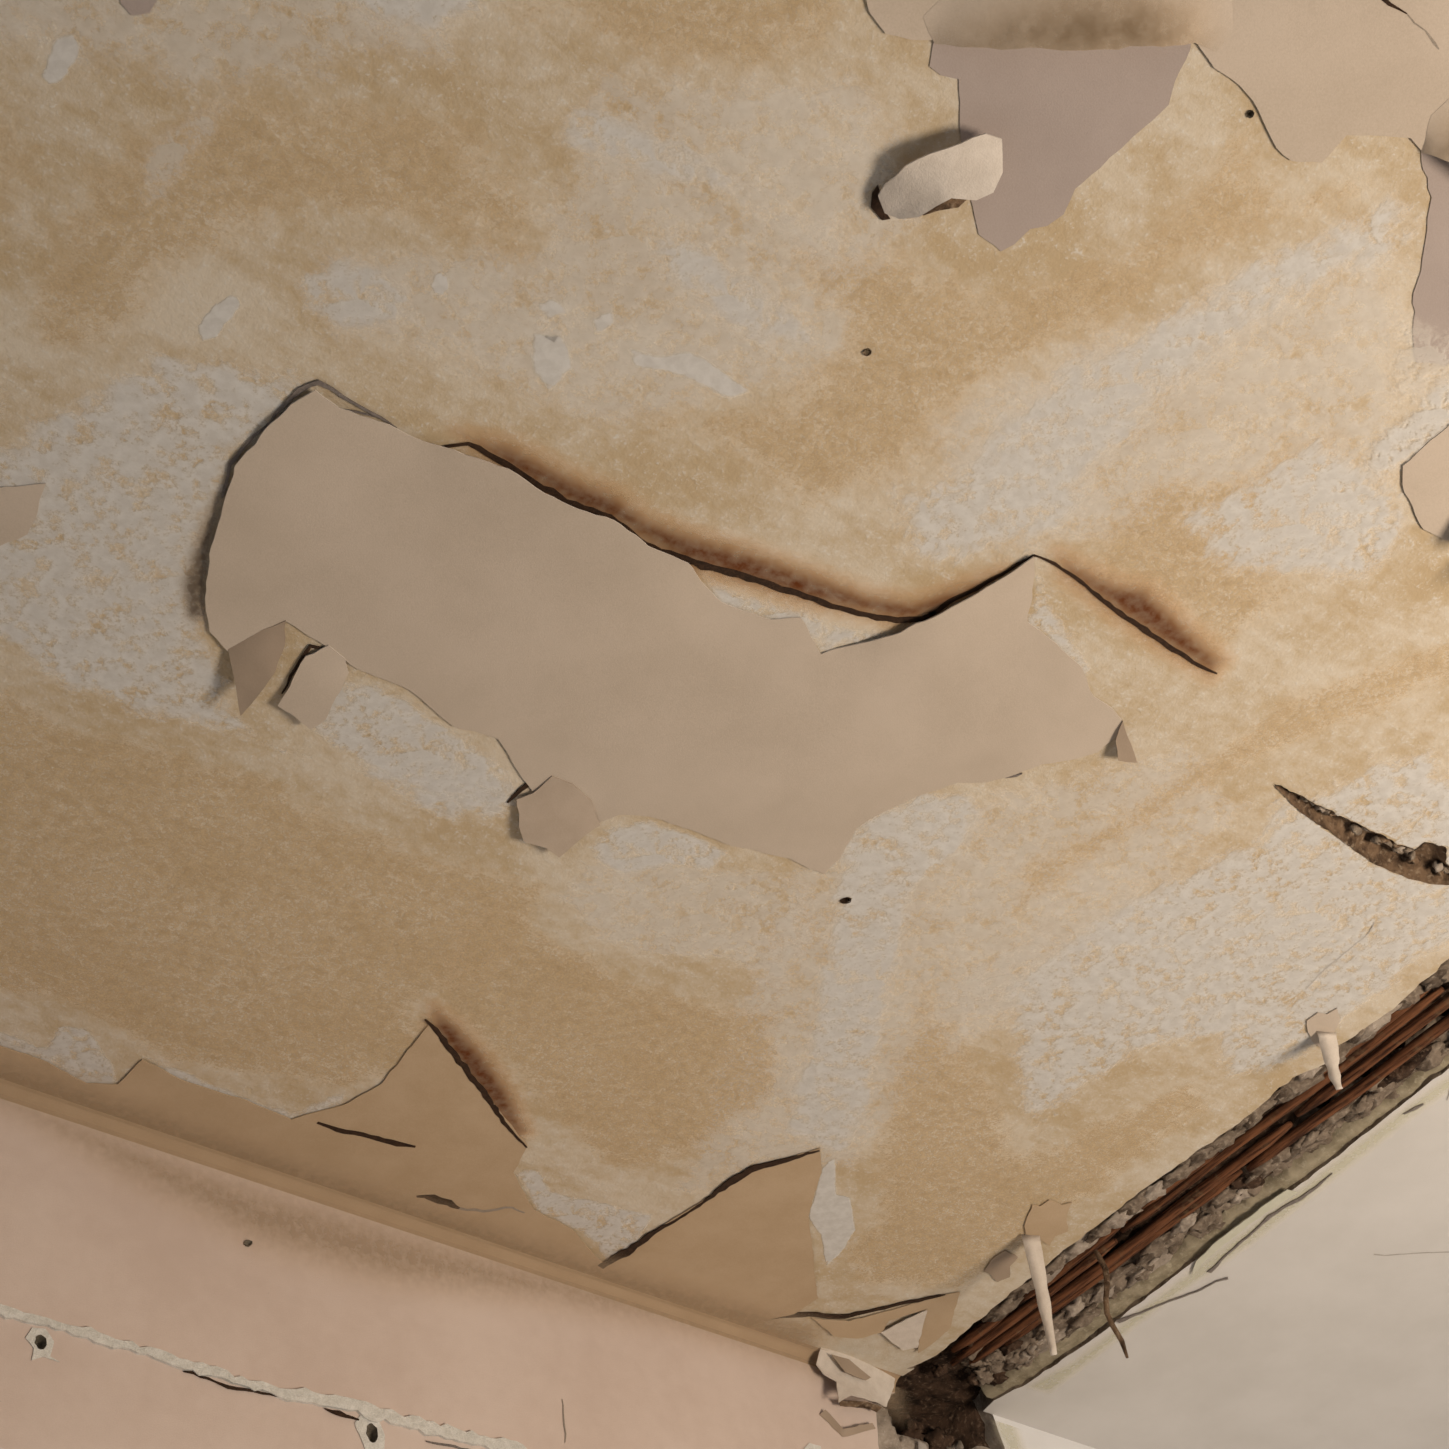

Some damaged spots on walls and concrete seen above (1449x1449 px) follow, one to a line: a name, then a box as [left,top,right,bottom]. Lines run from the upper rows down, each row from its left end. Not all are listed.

leakage [44,102,524,339]
peeling [871,133,1003,220]
peeling [1198,0,1449,163]
crack [1382,0,1439,50]
leakage [724,155,1255,490]
peeling [1185,378,1449,578]
leakage [0,700,774,1158]
peeling [0,350,1137,1449]
crack [0,1304,527,1449]
crack [598,1150,820,1269]
crack [774,1294,945,1319]
leakage [810,1025,1193,1286]